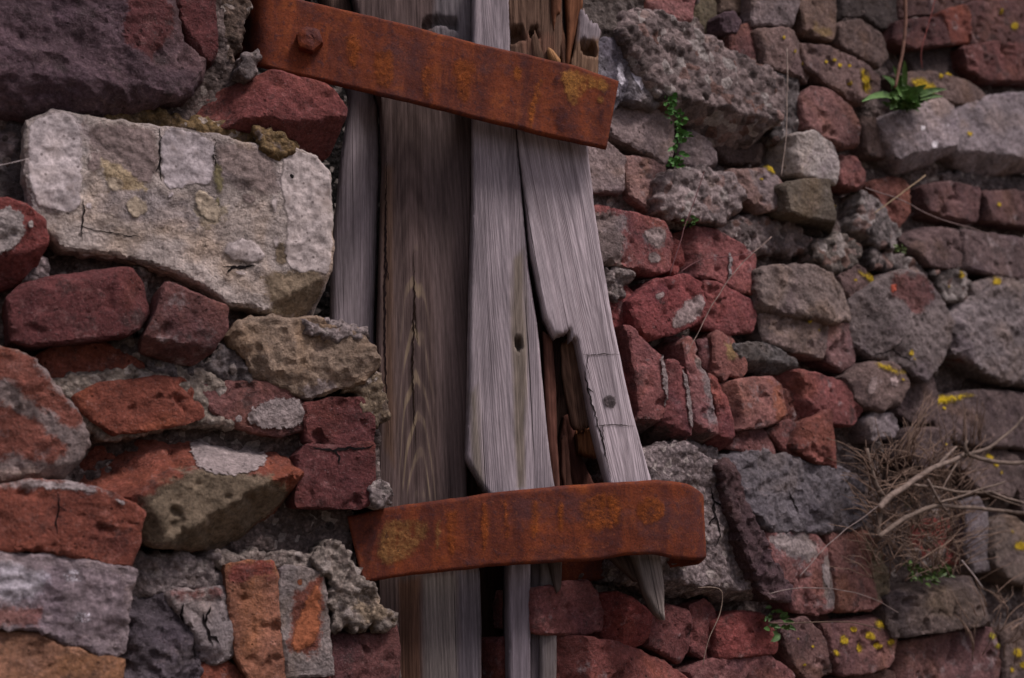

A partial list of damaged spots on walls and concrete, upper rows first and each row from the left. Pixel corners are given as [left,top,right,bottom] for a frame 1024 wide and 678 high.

crack [154,128,162,182]
crack [81,204,145,238]
crack [311,161,418,463]
crack [180,603,220,646]